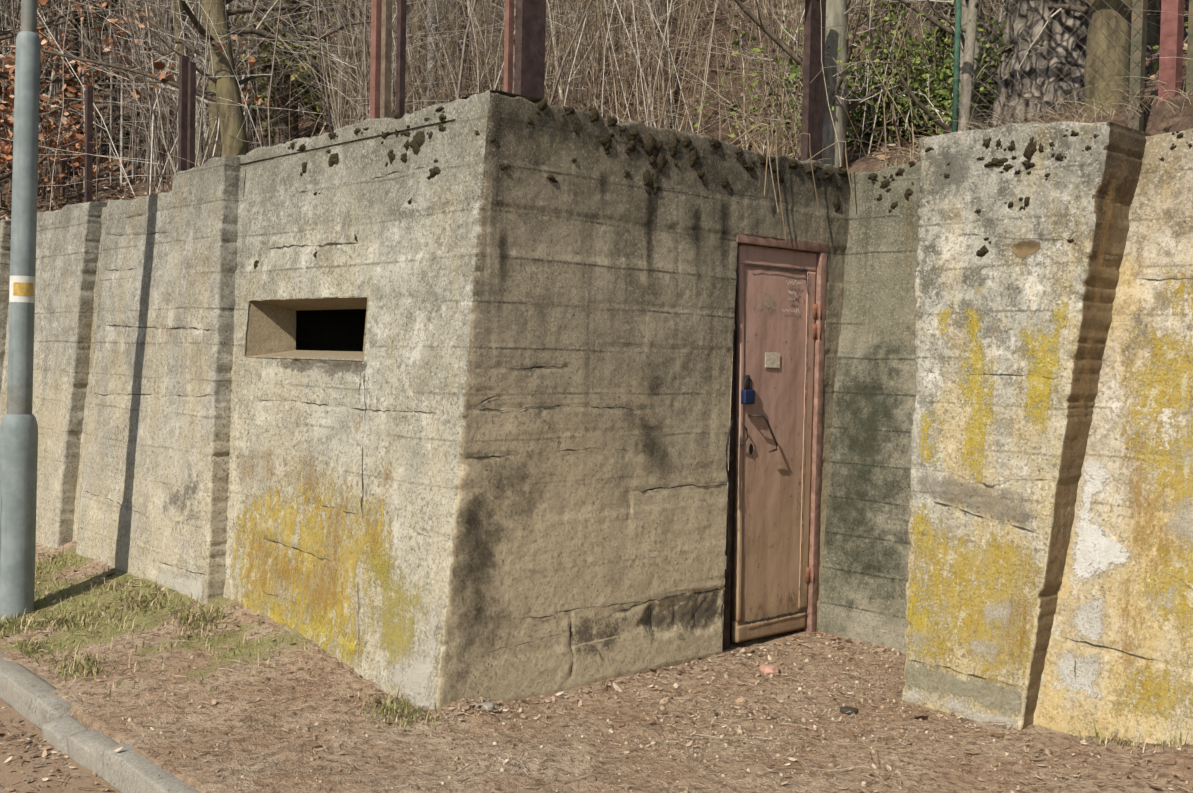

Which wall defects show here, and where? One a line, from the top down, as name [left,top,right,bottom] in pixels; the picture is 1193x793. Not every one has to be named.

damp [630,184,658,256]
damp [692,209,701,273]
damp [719,200,729,263]
spalling [1012,240,1041,261]
damp [453,501,499,645]
crack [491,484,730,676]